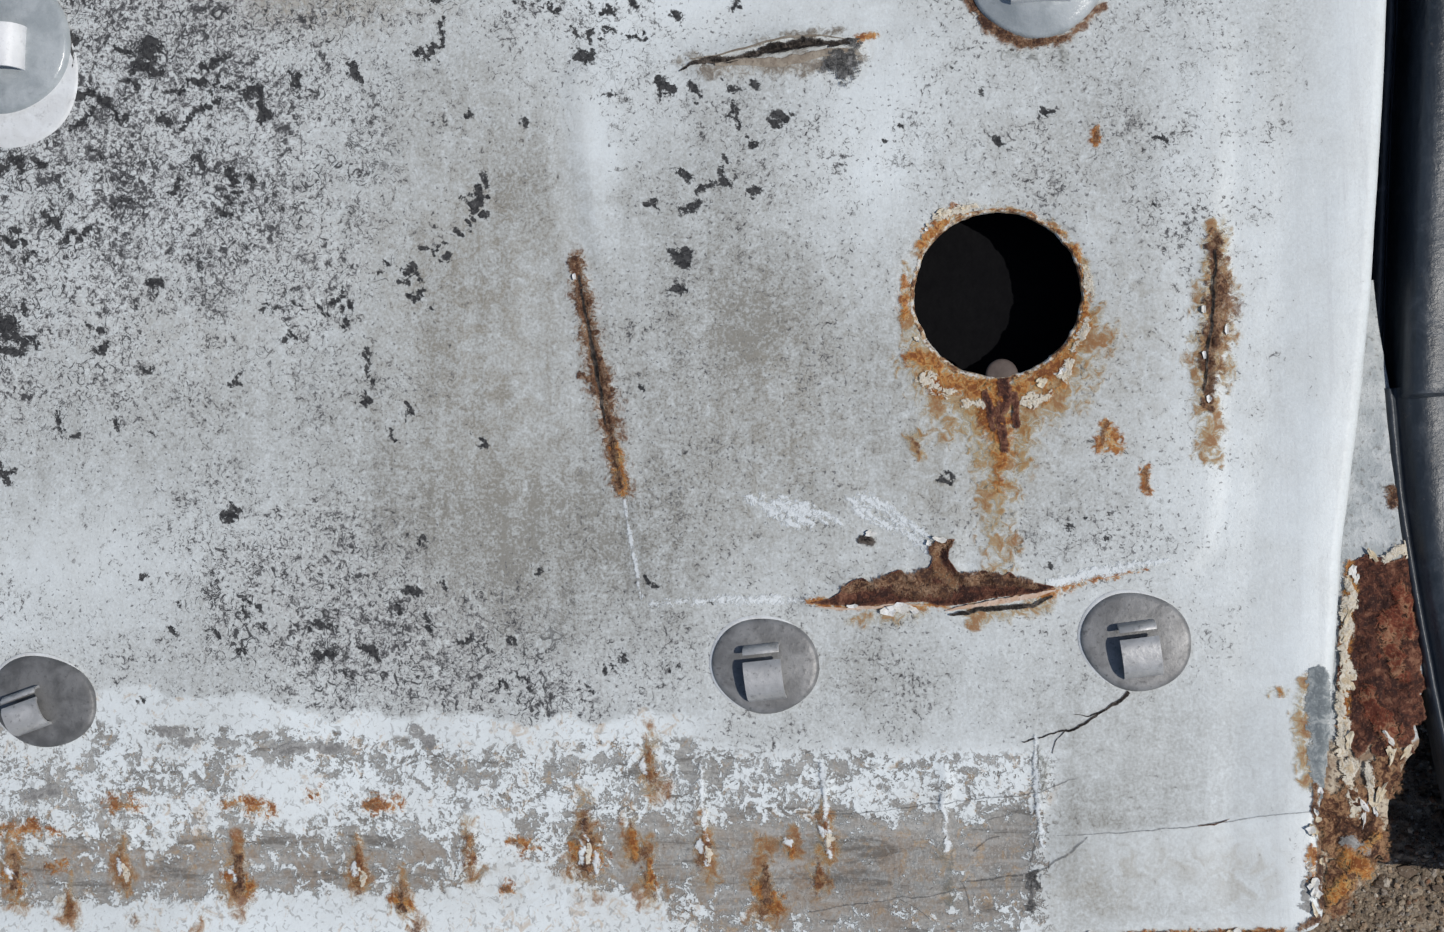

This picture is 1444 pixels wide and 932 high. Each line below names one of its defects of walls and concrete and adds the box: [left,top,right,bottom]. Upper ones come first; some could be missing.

crack [676,27,867,86]
rust [964,0,1108,49]
rust [566,249,635,498]
rust [895,202,1118,575]
rust [1182,218,1242,469]
peeling [153,724,241,750]
peeling [272,737,352,758]
peeling [405,723,439,750]
crack [1022,691,1130,754]
rust [1124,554,1427,932]
peeling [699,764,710,866]
peeling [819,763,832,859]